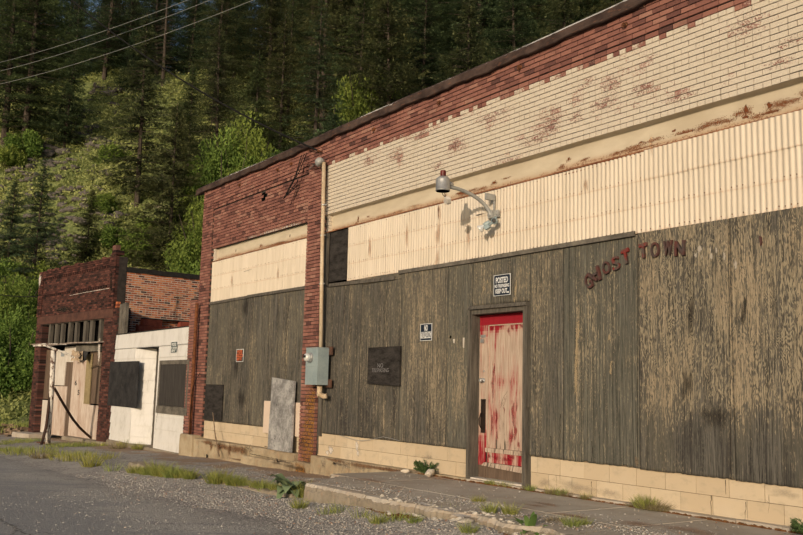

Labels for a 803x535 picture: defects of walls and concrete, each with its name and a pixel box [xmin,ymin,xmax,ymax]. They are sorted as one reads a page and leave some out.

corrosion [559,91,803,175]
peeling [488,364,520,462]